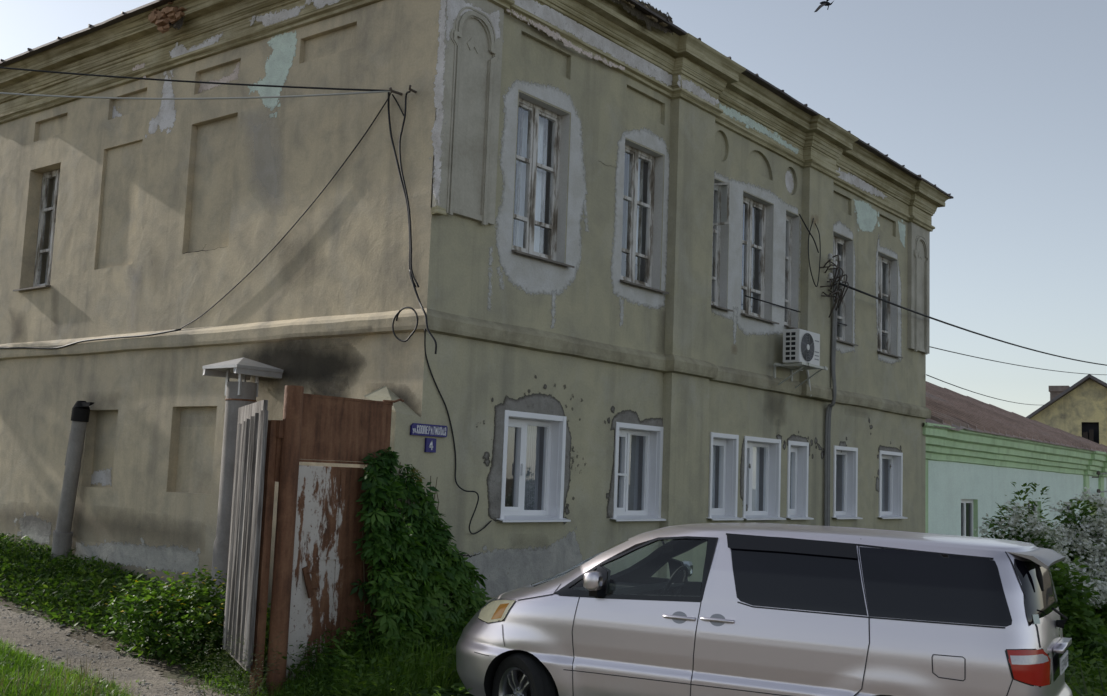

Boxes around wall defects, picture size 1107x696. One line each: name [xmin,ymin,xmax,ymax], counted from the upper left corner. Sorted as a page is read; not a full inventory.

peeling [145,32,223,138]
peeling [199,0,340,120]
peeling [429,0,799,207]
peeling [836,167,887,232]
spalling [465,384,582,598]
spalling [606,406,663,518]